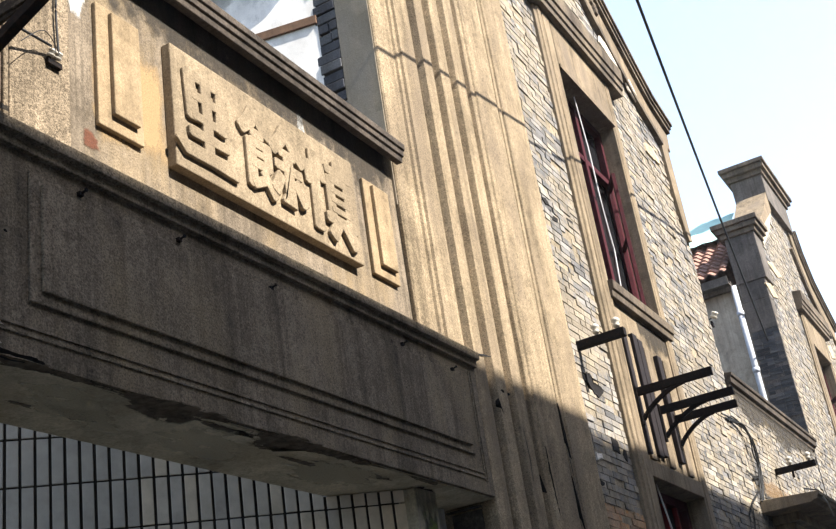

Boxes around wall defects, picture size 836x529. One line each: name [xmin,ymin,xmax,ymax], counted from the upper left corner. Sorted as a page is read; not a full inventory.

peeling [0,356,392,481]